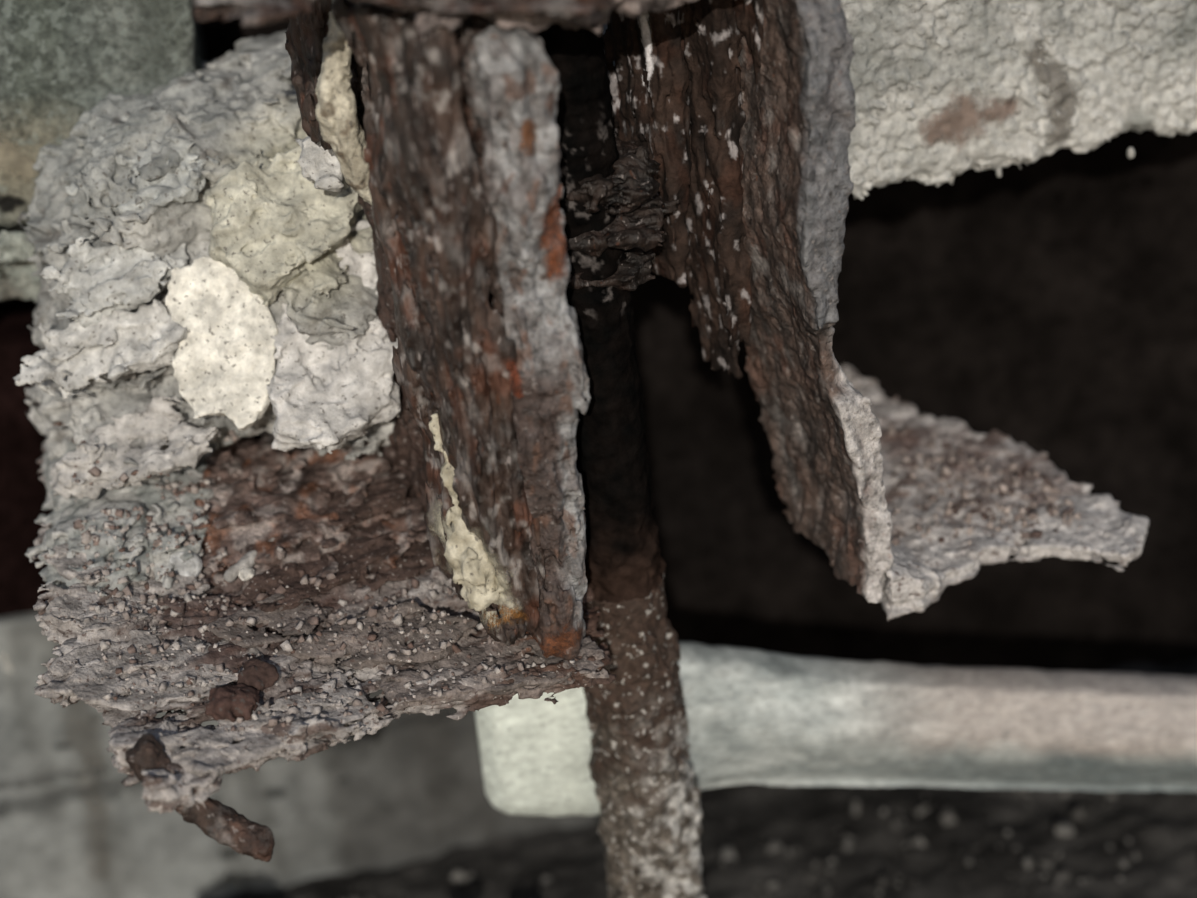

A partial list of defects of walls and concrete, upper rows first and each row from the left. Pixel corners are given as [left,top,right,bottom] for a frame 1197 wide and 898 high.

spalling [0,31,401,500]
peeling [175,797,275,862]
peeling [34,509,610,782]
rust [285,0,579,658]
leakage [429,413,513,623]
rust [603,0,765,379]